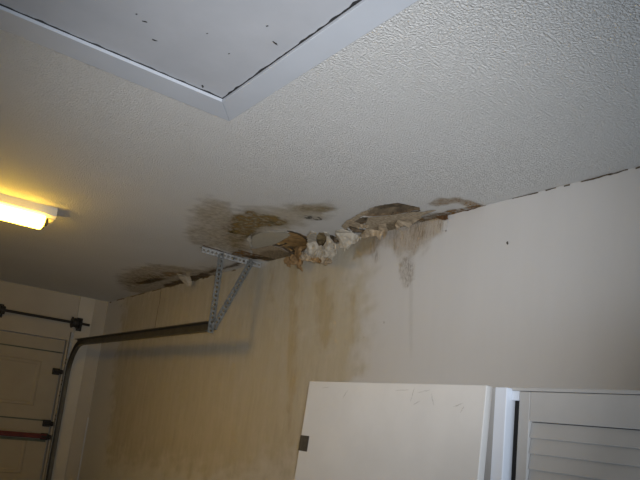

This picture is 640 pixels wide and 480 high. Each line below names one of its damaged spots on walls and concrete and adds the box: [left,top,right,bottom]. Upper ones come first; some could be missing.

leakage [231,211,286,241]
peeling [284,207,383,272]